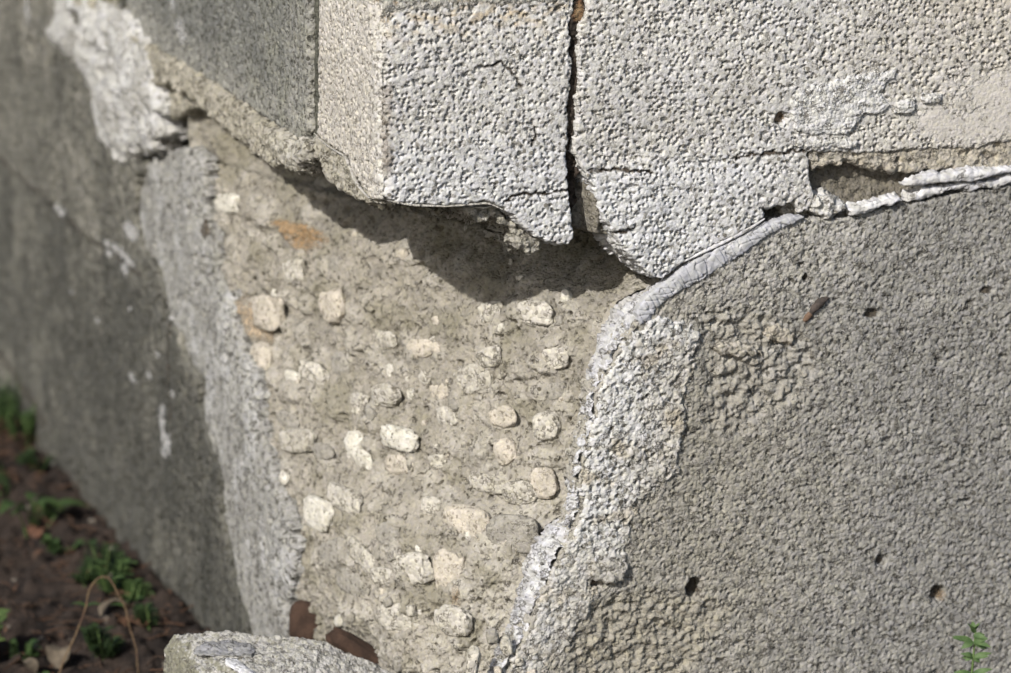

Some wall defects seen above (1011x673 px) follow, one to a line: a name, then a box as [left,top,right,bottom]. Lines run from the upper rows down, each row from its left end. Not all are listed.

crack [482,61,523,87]
crack [505,0,652,211]
crack [734,148,806,161]
spalling [168,89,1011,673]